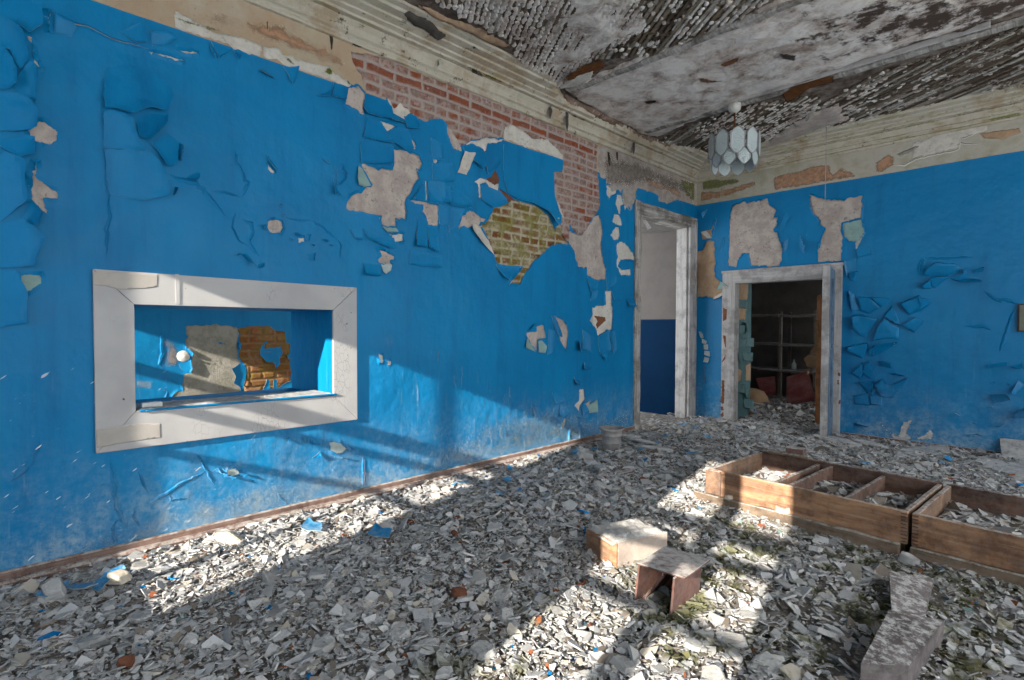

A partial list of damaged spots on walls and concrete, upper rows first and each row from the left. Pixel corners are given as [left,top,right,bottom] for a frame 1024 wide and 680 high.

peeling [0,0,76,328]
flaking render [120,11,784,431]
flaking render [808,193,866,264]
peeling [897,125,1021,158]